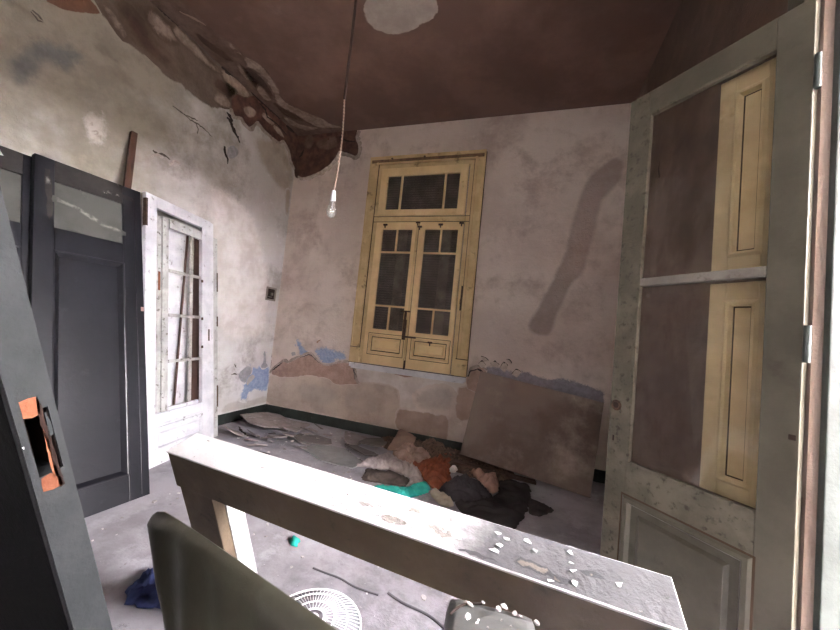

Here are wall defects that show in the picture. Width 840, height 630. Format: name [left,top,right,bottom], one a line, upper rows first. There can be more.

peeling [362,0,439,35]
peeling [43,0,362,181]
crack [173,106,240,164]
water stain [525,155,627,339]
peeling [220,336,608,440]